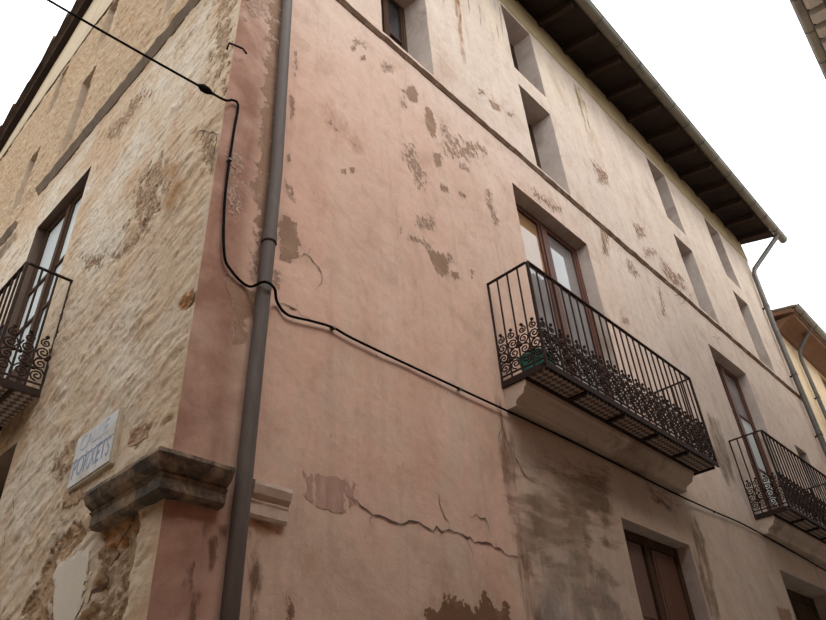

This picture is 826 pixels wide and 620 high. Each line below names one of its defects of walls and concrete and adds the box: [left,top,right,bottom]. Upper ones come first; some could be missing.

peeling [195,0,282,272]
peeling [401,142,428,191]
peeling [400,85,488,174]
peeling [277,214,302,263]
peeling [399,212,460,280]
peeling [485,189,499,226]
spalling [85,515,141,620]
crack [351,494,525,575]
peeling [424,590,511,620]